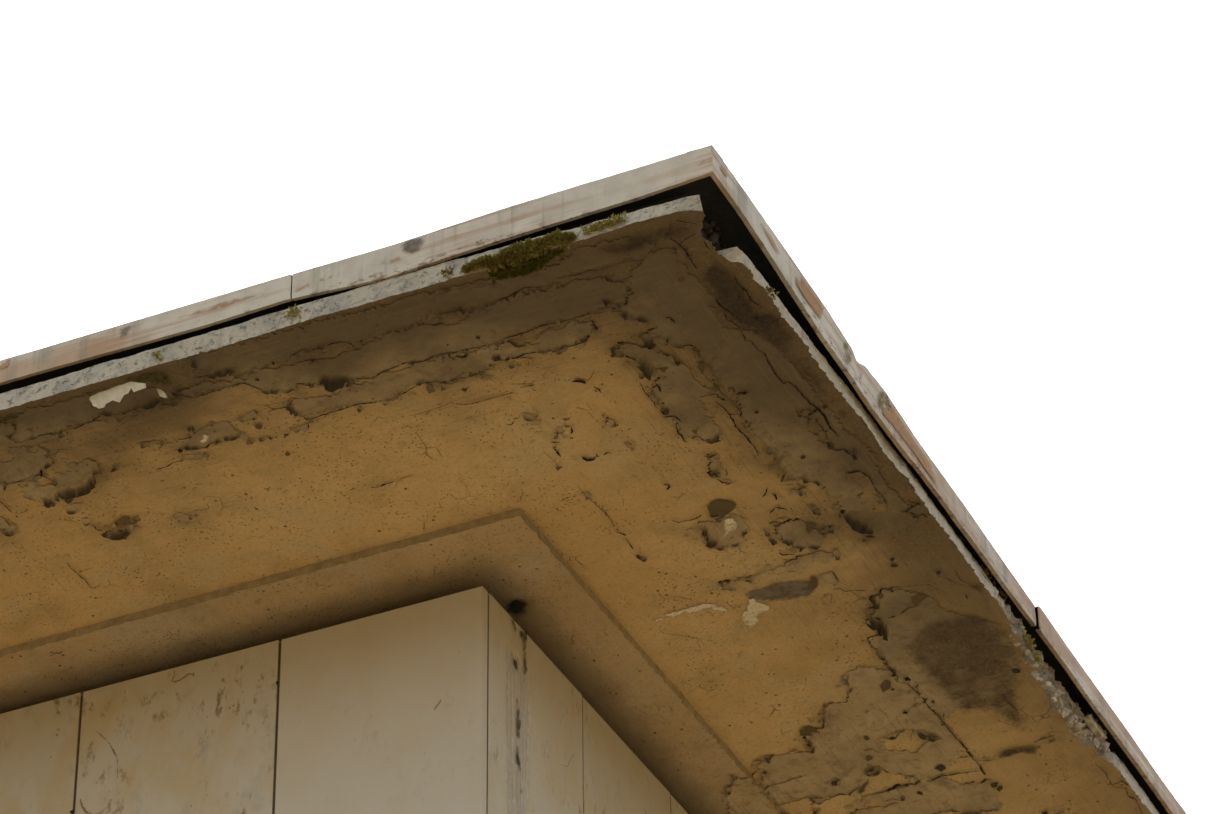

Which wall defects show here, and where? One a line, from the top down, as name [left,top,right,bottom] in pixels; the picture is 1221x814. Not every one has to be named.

crack [663,220,710,269]
crack [715,277,763,340]
peeling [0,237,928,591]
crack [413,384,535,416]
crack [698,363,759,454]
peeling [883,406,937,483]
leakage [507,600,527,814]
peeling [720,586,1110,814]
leakage [911,617,1022,723]